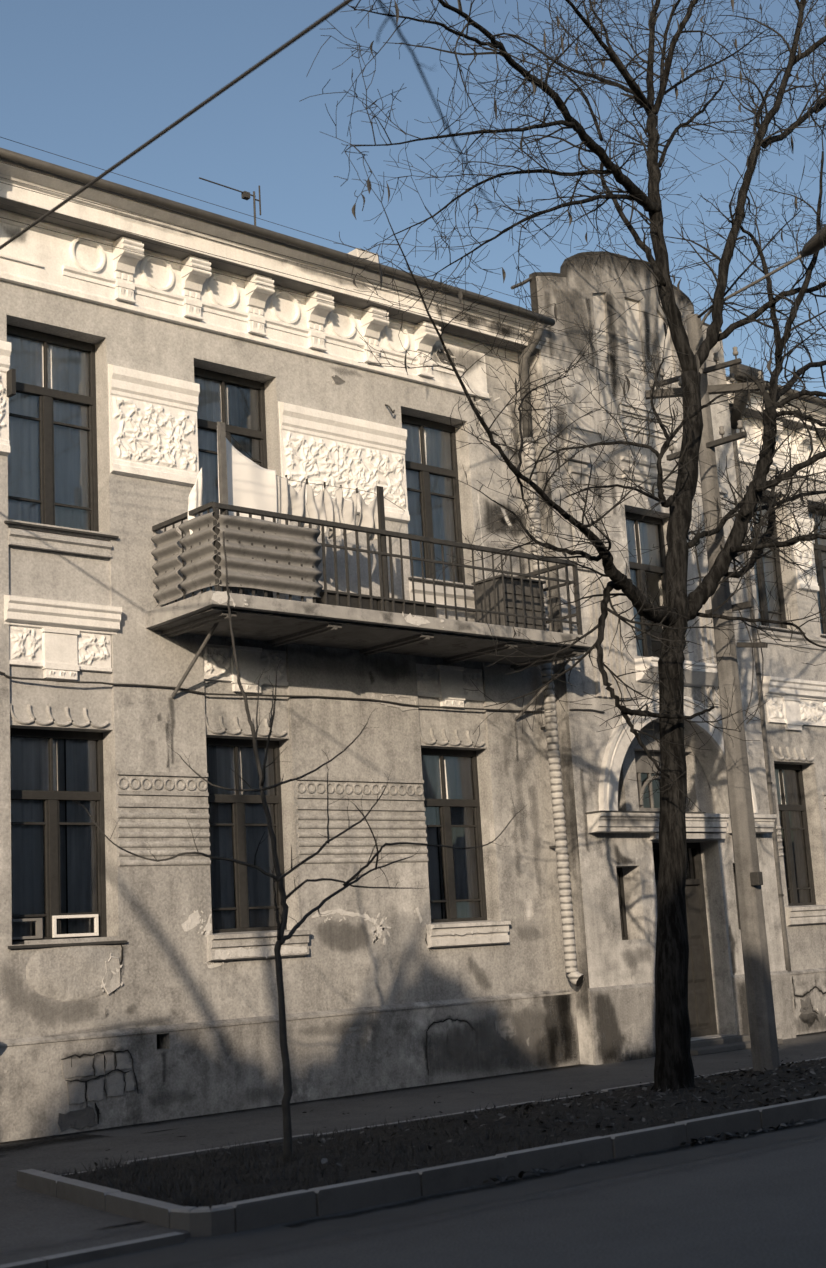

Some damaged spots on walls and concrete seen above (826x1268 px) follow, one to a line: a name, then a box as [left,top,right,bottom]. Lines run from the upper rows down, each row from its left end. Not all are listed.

peeling [311,909,391,945]
peeling [101,953,123,995]
crack [792,976,826,1014]
flaking render [56,1052,135,1133]